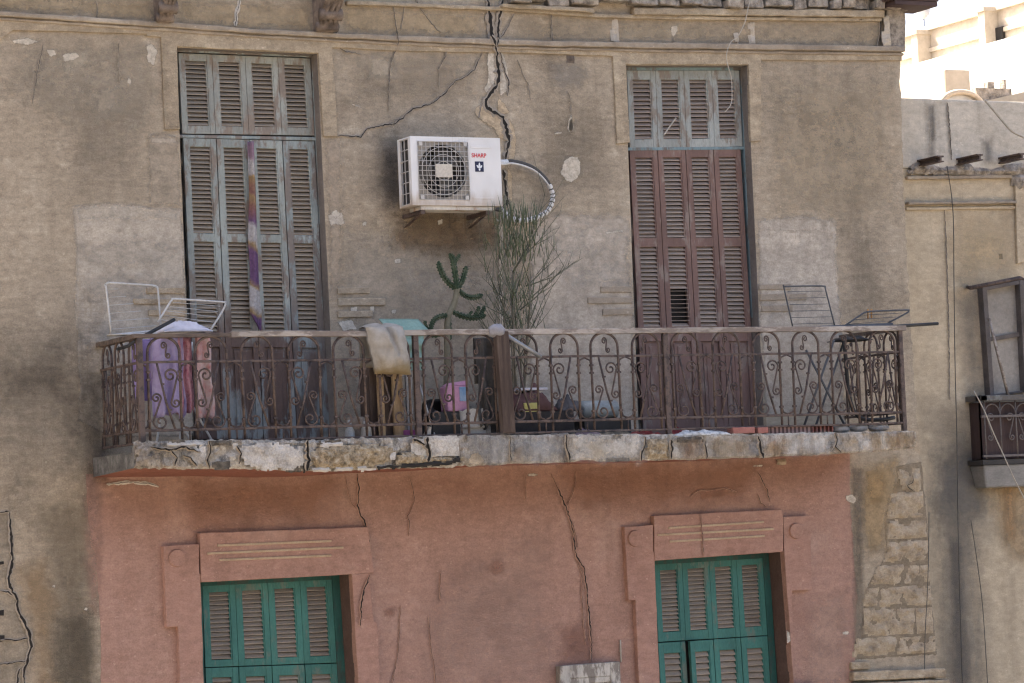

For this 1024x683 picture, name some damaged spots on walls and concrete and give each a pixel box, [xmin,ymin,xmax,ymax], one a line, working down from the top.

crack [338,0,531,326]
peeling [560,157,580,182]
crack [0,510,34,683]
spalling [135,435,484,473]
crack [345,474,371,548]
crack [359,575,370,626]
crack [406,437,432,536]
crack [551,435,593,662]
spalling [645,436,703,459]
spalling [843,462,937,660]